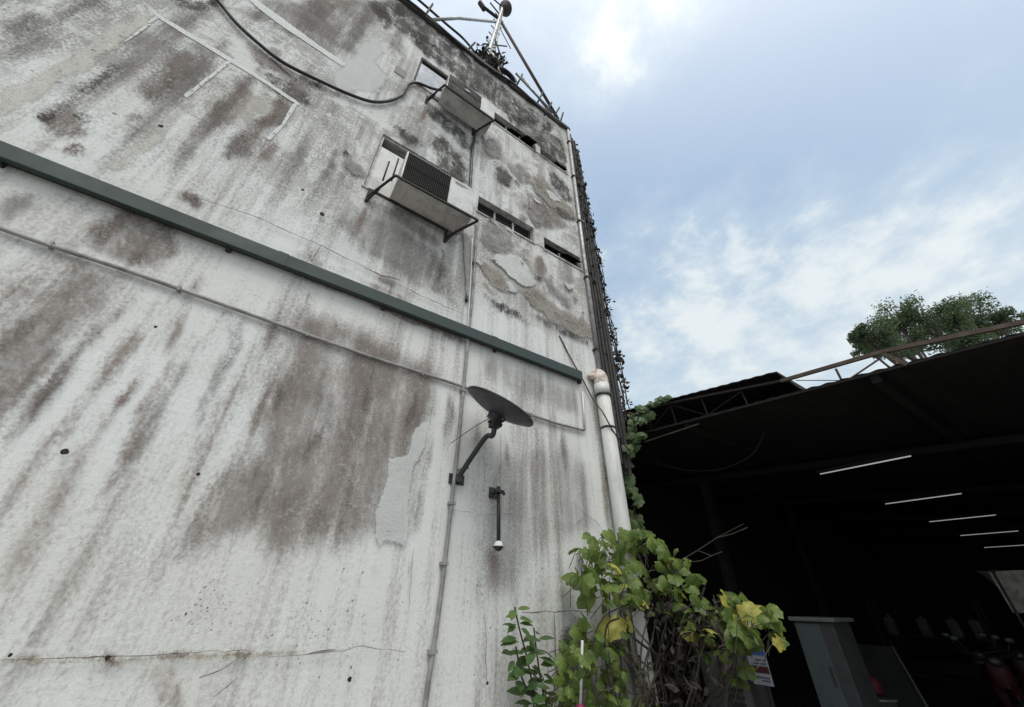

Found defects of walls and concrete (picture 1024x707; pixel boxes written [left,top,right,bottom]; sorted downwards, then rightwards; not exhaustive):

leakage [37,0,222,124]
leakage [127,42,226,139]
leakage [394,102,471,184]
leakage [497,166,512,188]
leakage [548,170,573,201]
spalling [473,218,593,345]
leakage [0,264,104,419]
leakage [95,333,140,389]
leakage [122,397,167,464]
leakage [185,311,437,551]
crack [2,645,403,705]